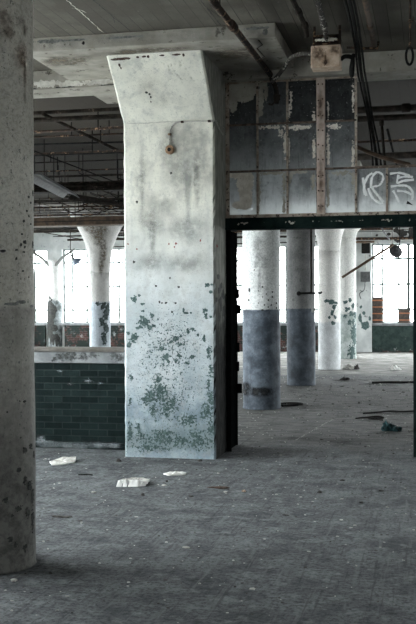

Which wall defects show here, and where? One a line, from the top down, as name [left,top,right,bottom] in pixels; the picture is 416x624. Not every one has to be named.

peeling [229,83,268,117]
peeling [230,91,316,212]
peeling [326,101,355,207]
peeling [47,296,61,347]
peeling [95,301,109,345]
peeling [324,298,413,359]
peeling [126,274,226,454]